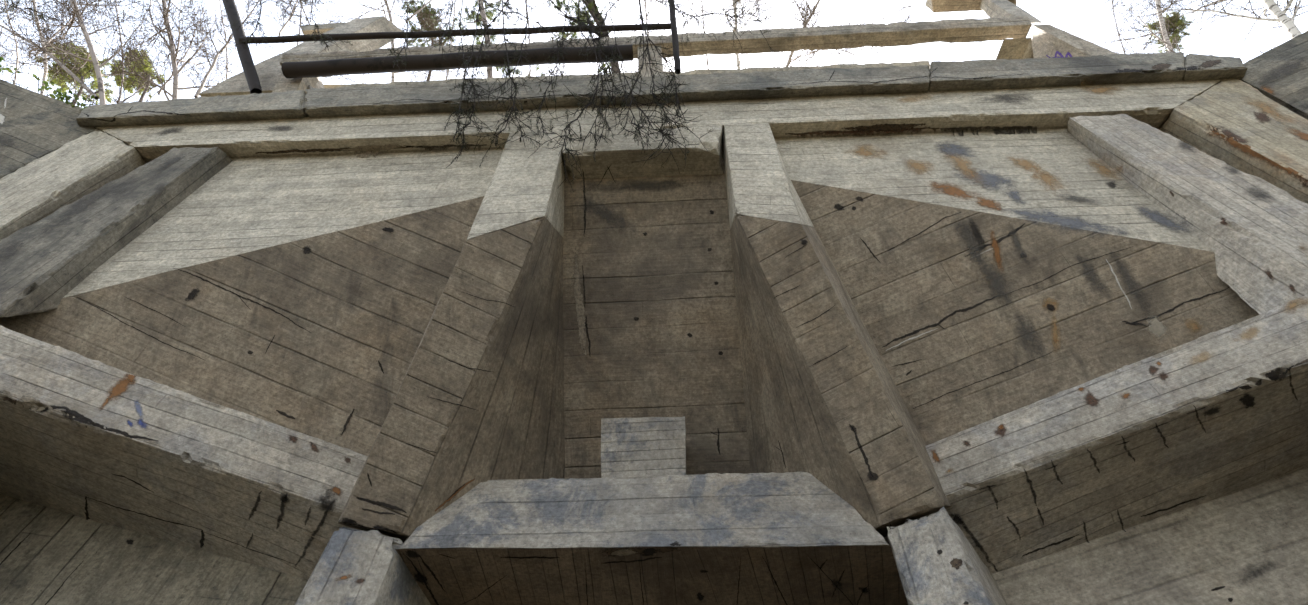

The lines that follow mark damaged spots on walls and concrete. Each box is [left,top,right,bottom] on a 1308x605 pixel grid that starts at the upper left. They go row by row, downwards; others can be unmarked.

crack [849,424,878,481]
crack [84,474,296,565]
crack [1023,534,1079,556]
crack [1141,495,1206,517]